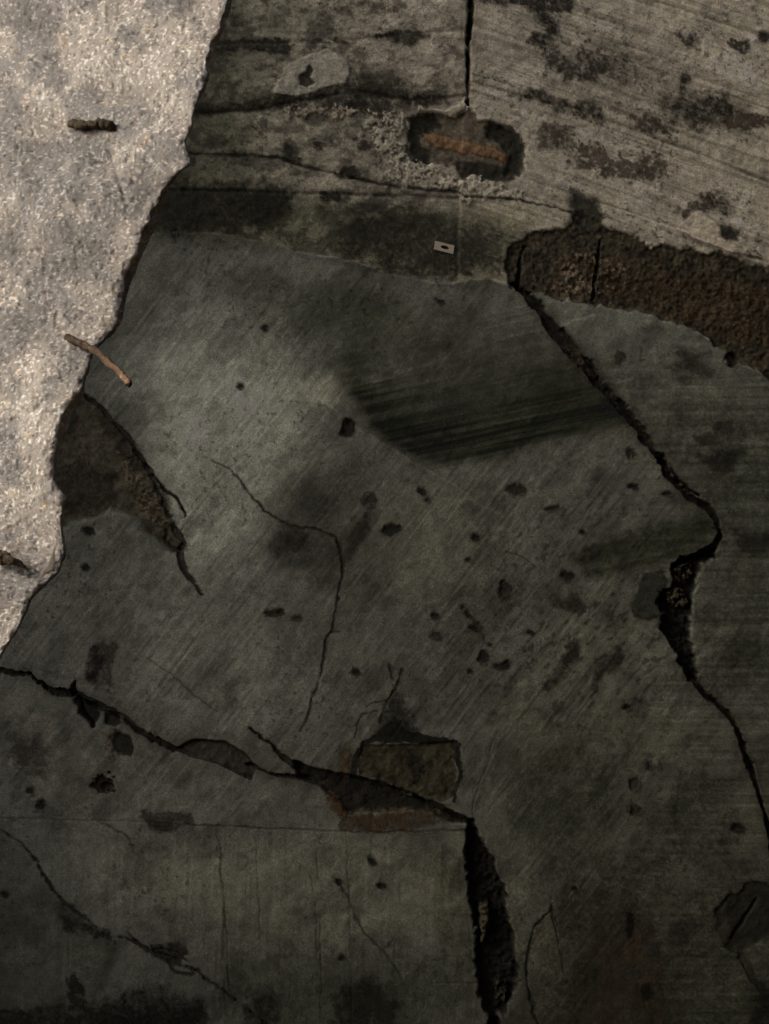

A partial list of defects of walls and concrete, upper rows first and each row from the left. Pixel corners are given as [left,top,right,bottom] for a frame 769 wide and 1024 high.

spalling [273,48,526,205]
crack [465,0,500,106]
mould [480,0,632,83]
mould [518,87,667,184]
mould [630,73,769,135]
mould [678,191,762,259]
spalling [504,189,769,380]
crack [511,241,723,563]
spalling [55,396,187,552]
crack [0,667,184,752]
spalling [294,724,469,823]
crack [446,797,565,1024]